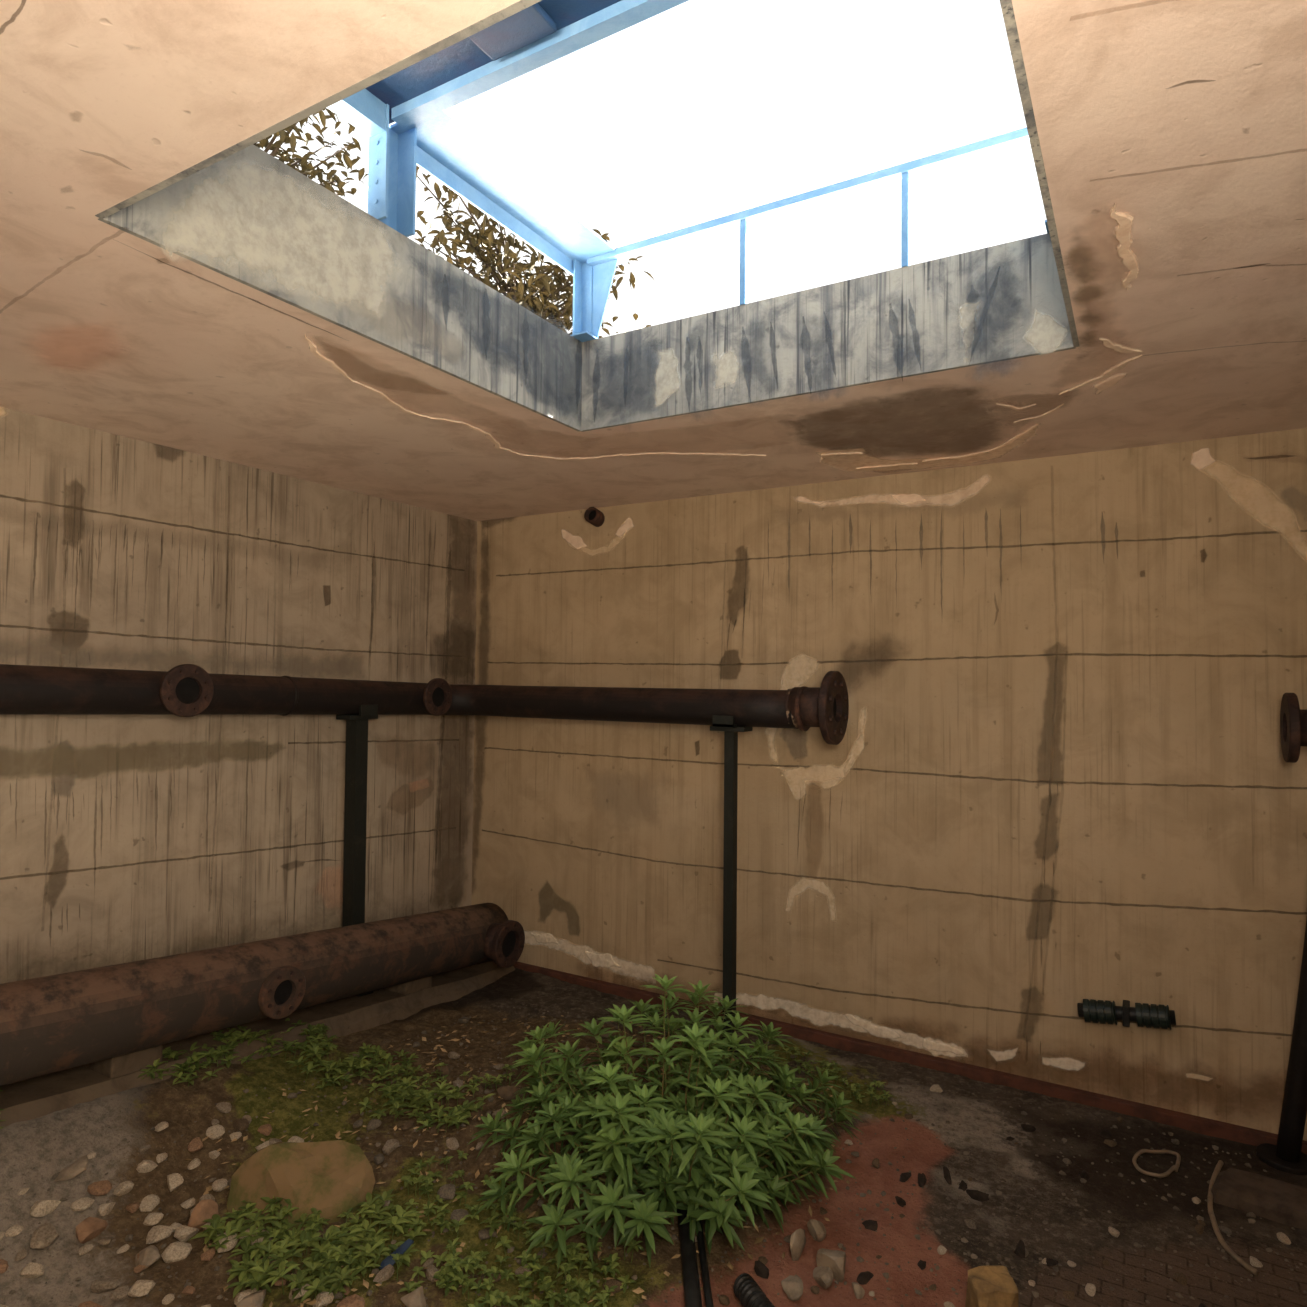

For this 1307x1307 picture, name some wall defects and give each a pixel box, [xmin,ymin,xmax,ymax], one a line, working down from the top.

spalling [1111,204,1138,290]
peeling [1026,315,1065,352]
peeling [1191,448,1307,556]
water stain [0,742,279,778]
efflorescence [715,993,964,1056]